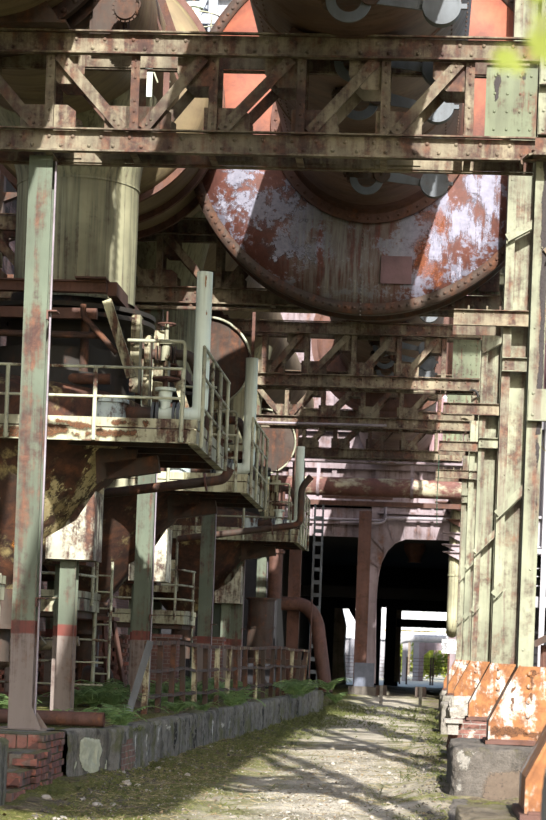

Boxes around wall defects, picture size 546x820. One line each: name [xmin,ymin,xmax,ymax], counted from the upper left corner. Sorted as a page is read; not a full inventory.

peeling [217,169,316,263]
corrosion [413,211,450,286]
peeling [426,171,501,282]
corrosion [0,425,19,437]
corrosion [47,418,150,438]
corrosion [490,726,541,741]